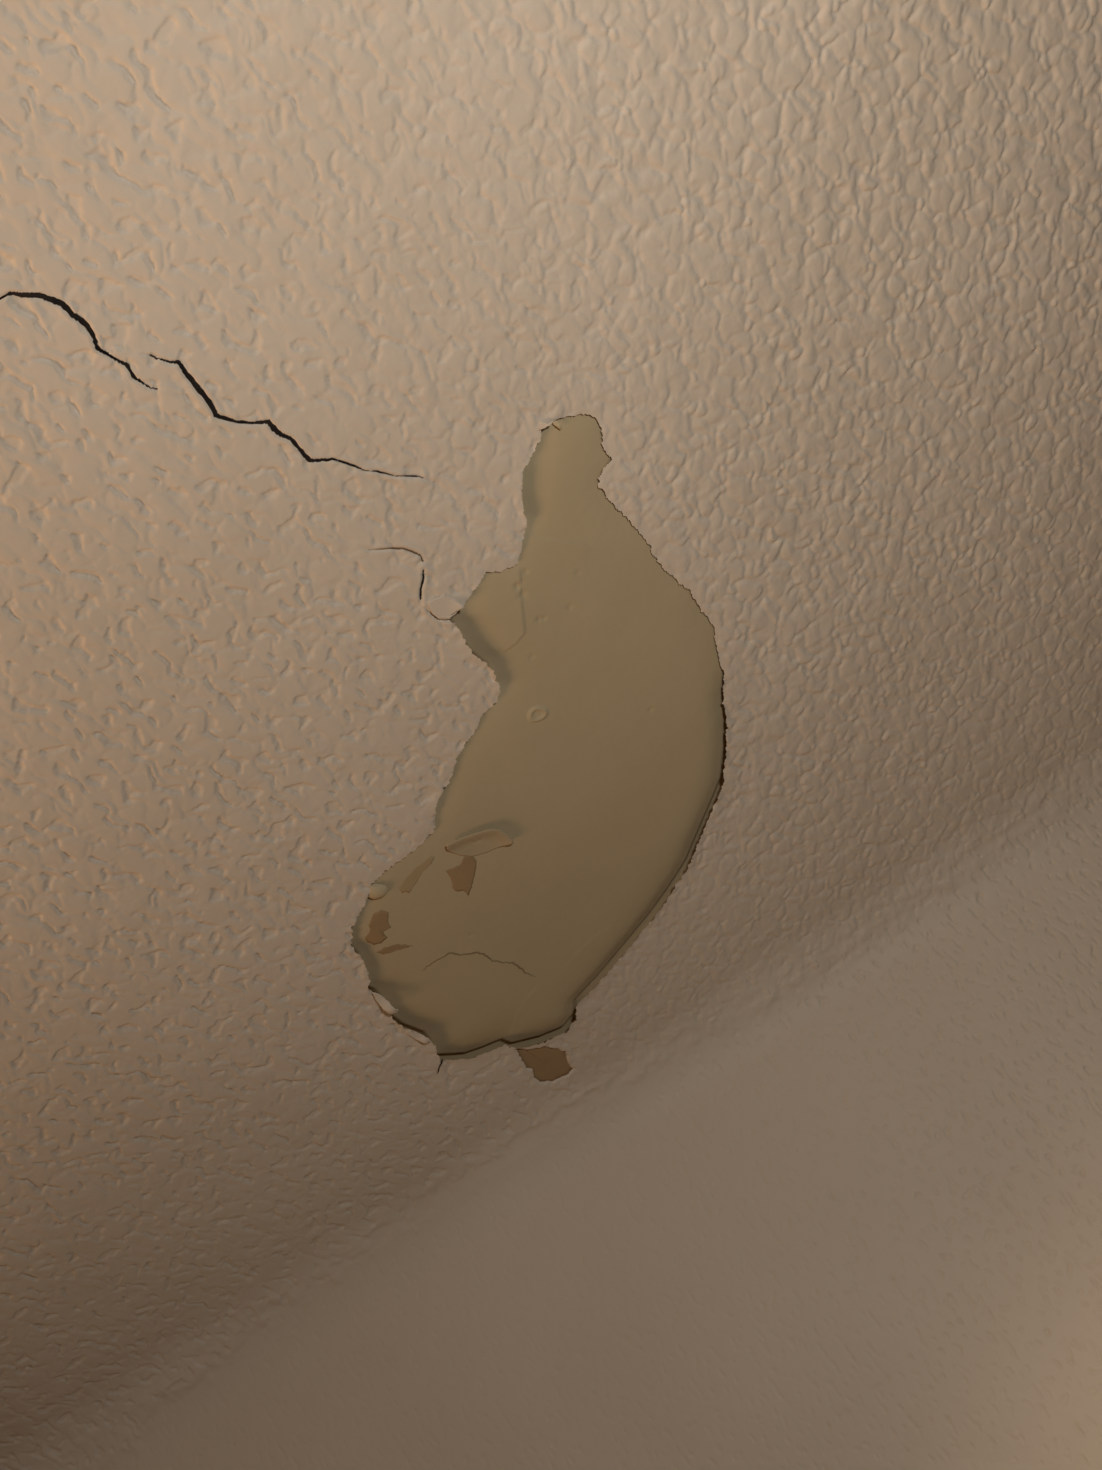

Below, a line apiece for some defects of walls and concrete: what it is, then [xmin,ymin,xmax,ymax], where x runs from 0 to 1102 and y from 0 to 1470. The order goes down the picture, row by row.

crack [0,291,423,478]
peeling [350,414,728,1082]